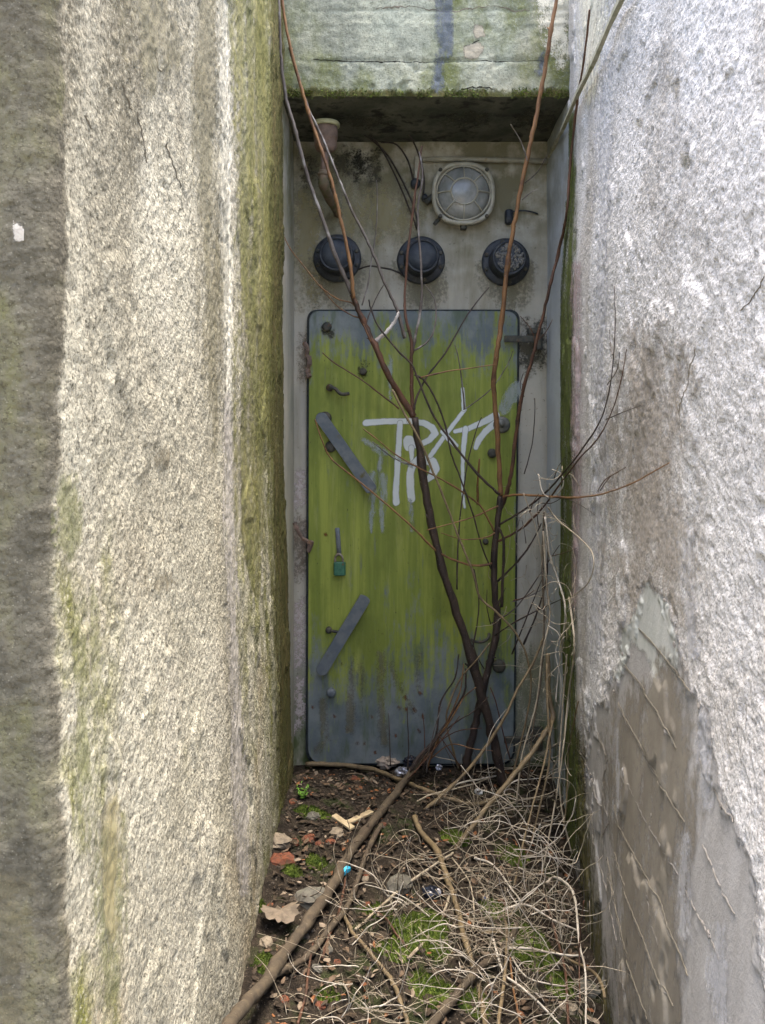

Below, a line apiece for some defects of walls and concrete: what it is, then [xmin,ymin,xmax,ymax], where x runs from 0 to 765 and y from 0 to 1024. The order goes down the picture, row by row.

water stain [431,0,454,93]
crack [122,85,182,187]
water stain [294,145,426,307]
peeling [576,580,765,1024]